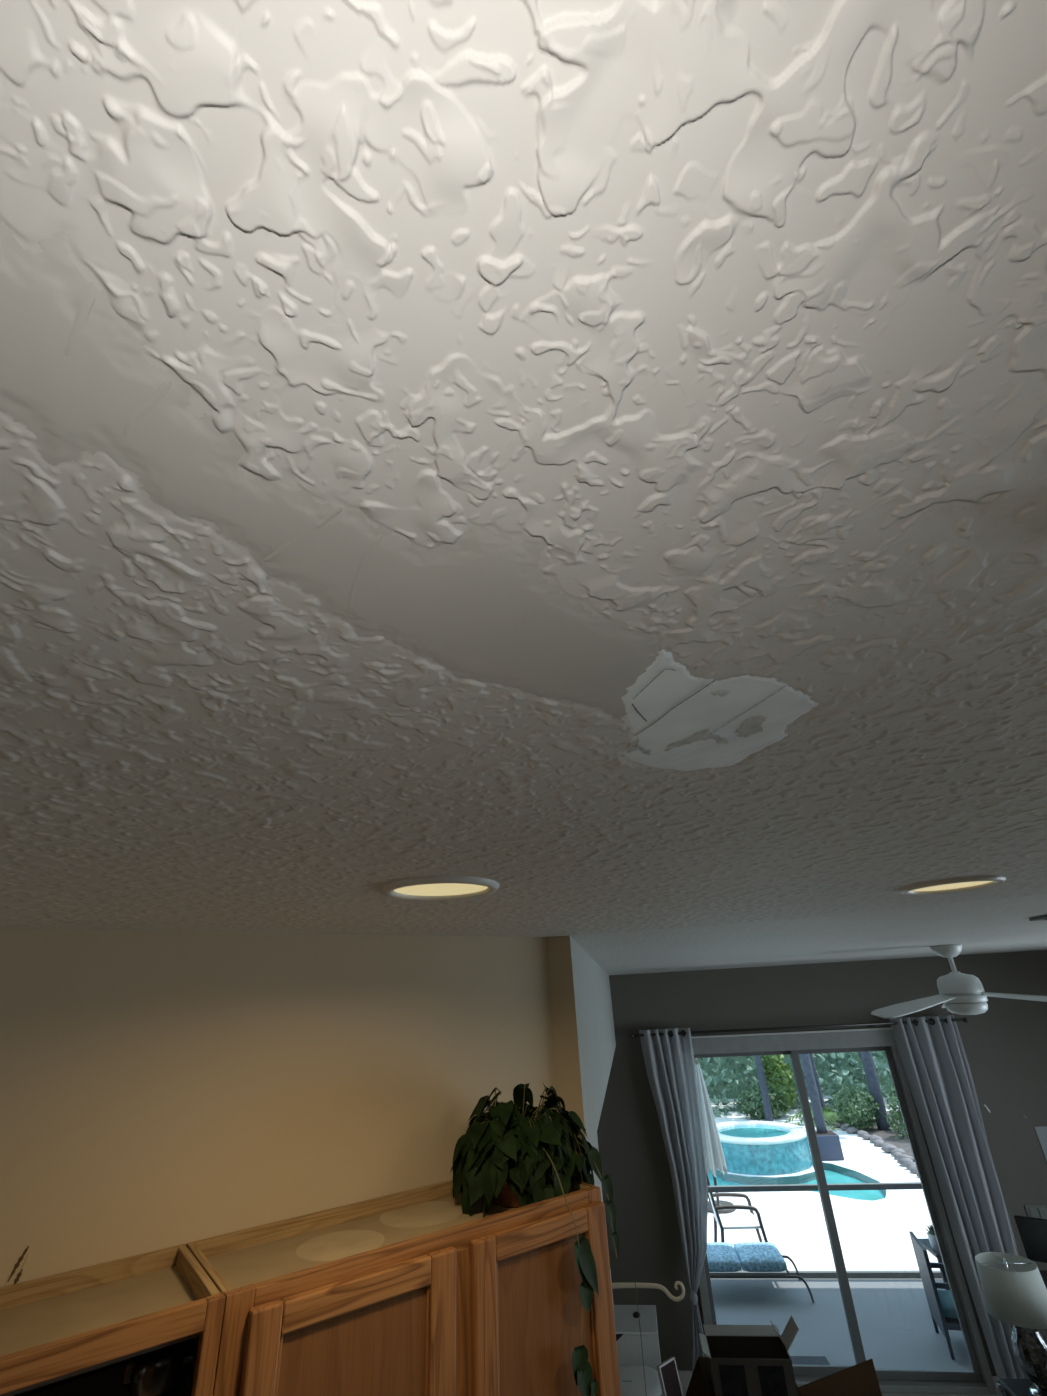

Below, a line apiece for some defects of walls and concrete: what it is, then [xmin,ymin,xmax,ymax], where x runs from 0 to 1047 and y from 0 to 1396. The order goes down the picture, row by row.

peeling [620,649,819,771]